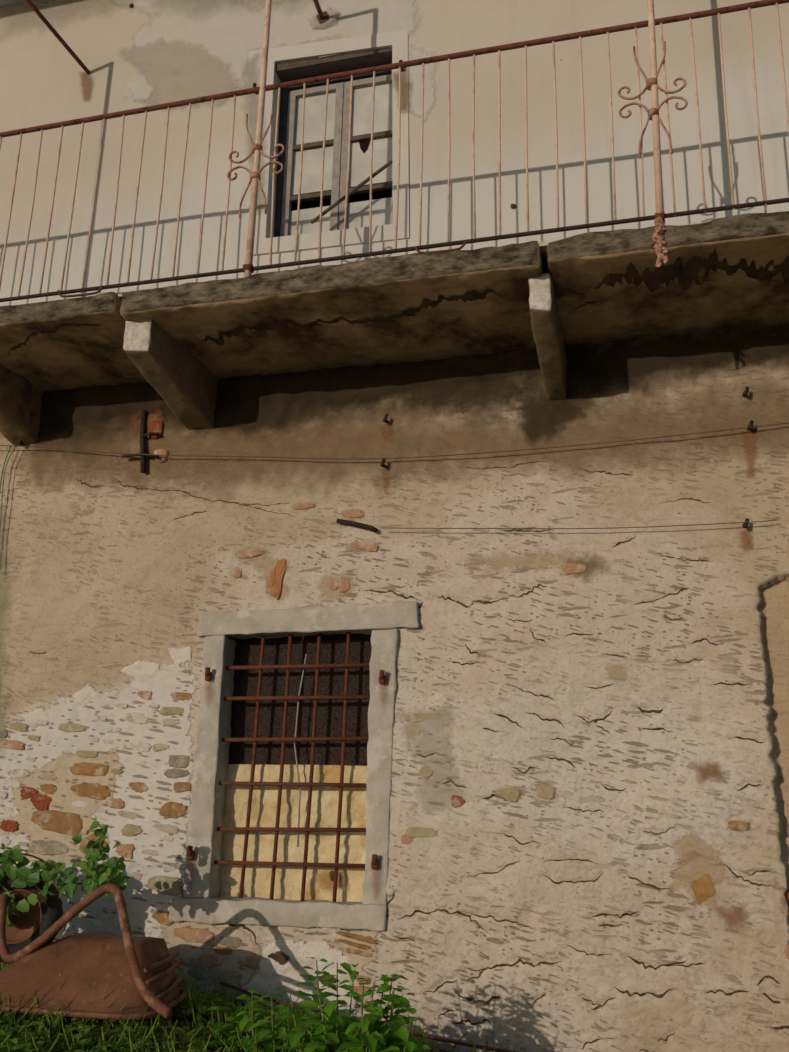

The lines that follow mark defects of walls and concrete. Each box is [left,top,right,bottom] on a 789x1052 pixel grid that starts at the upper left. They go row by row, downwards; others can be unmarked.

corrosion [82,73,91,99]
peeling [112,0,436,120]
crack [308,289,502,328]
leakage [31,326,789,483]
crack [77,478,293,520]
peeling [0,646,262,998]
spalling [772,869,789,972]